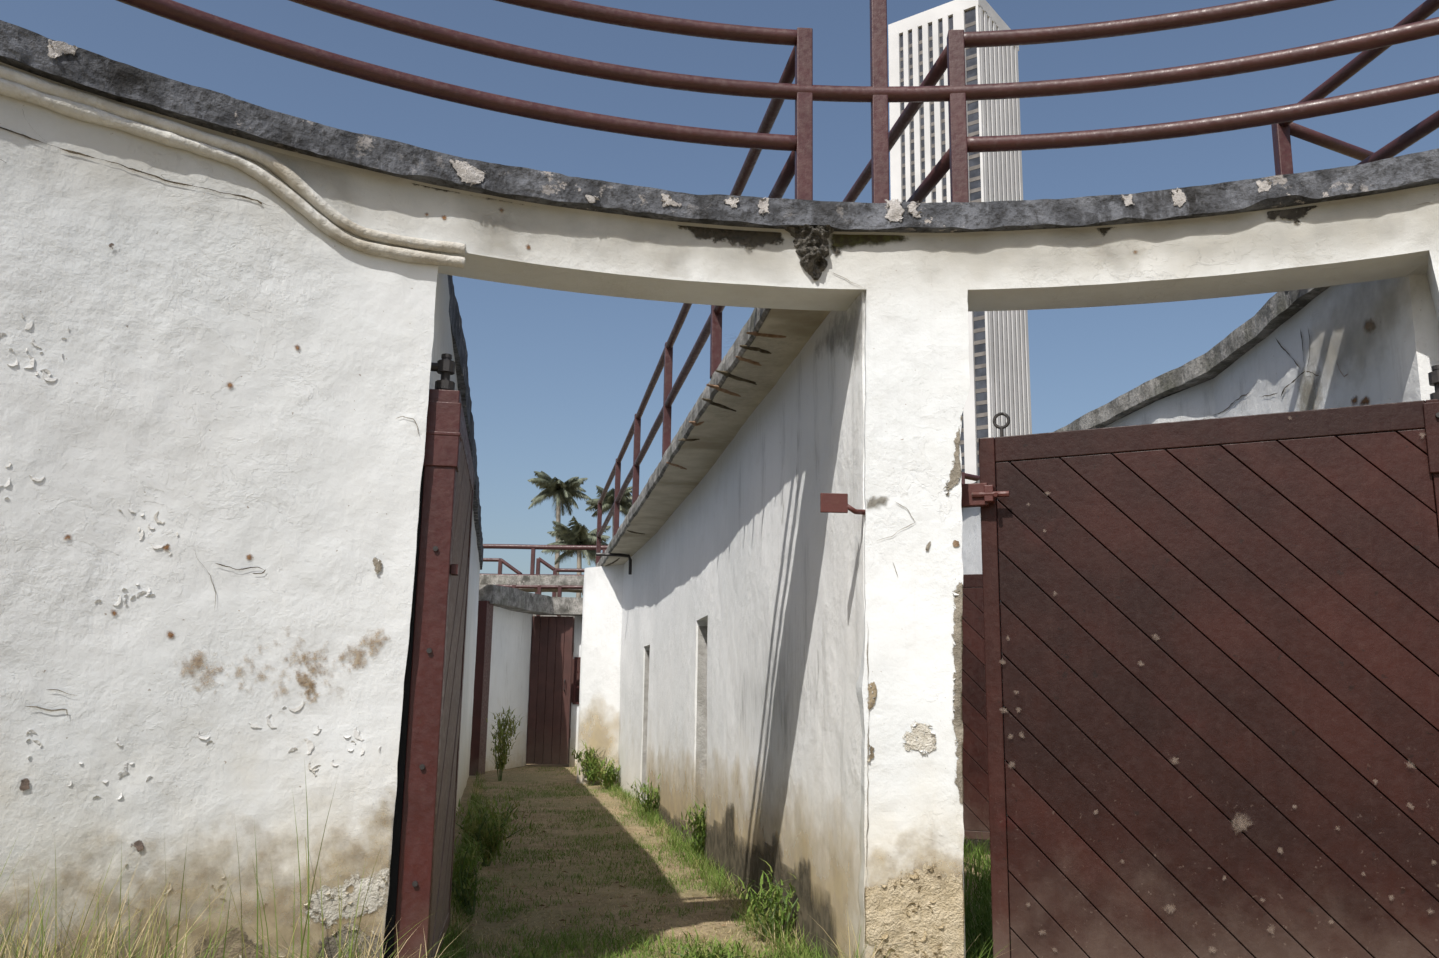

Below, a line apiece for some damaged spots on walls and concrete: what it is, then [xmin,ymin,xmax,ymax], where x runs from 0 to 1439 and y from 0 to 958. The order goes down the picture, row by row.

crack [0,112,274,207]
peeling [450,159,486,187]
crack [1207,330,1348,418]
peeling [903,722,936,754]
spalling [951,582,964,804]
spalling [297,868,390,958]
damp [648,772,849,958]
peeling [864,862,965,958]